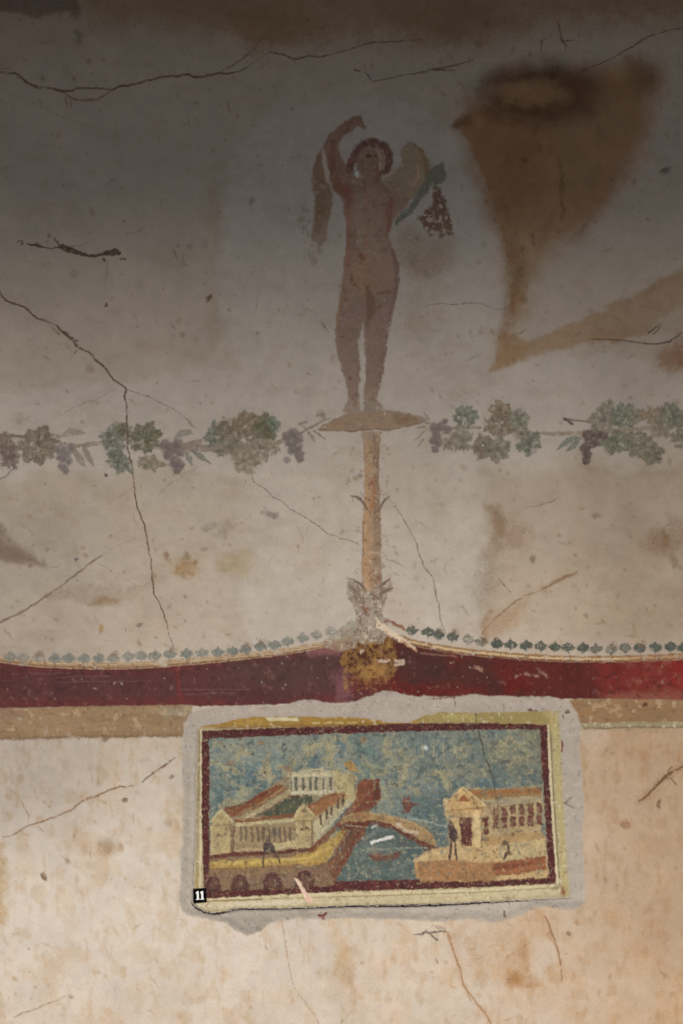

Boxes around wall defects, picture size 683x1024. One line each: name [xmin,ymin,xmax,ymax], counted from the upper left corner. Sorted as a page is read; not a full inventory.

crack [0,32,475,108]
leakage [66,0,683,376]
crack [0,290,197,651]
crack [199,467,580,638]
crack [1,756,176,841]